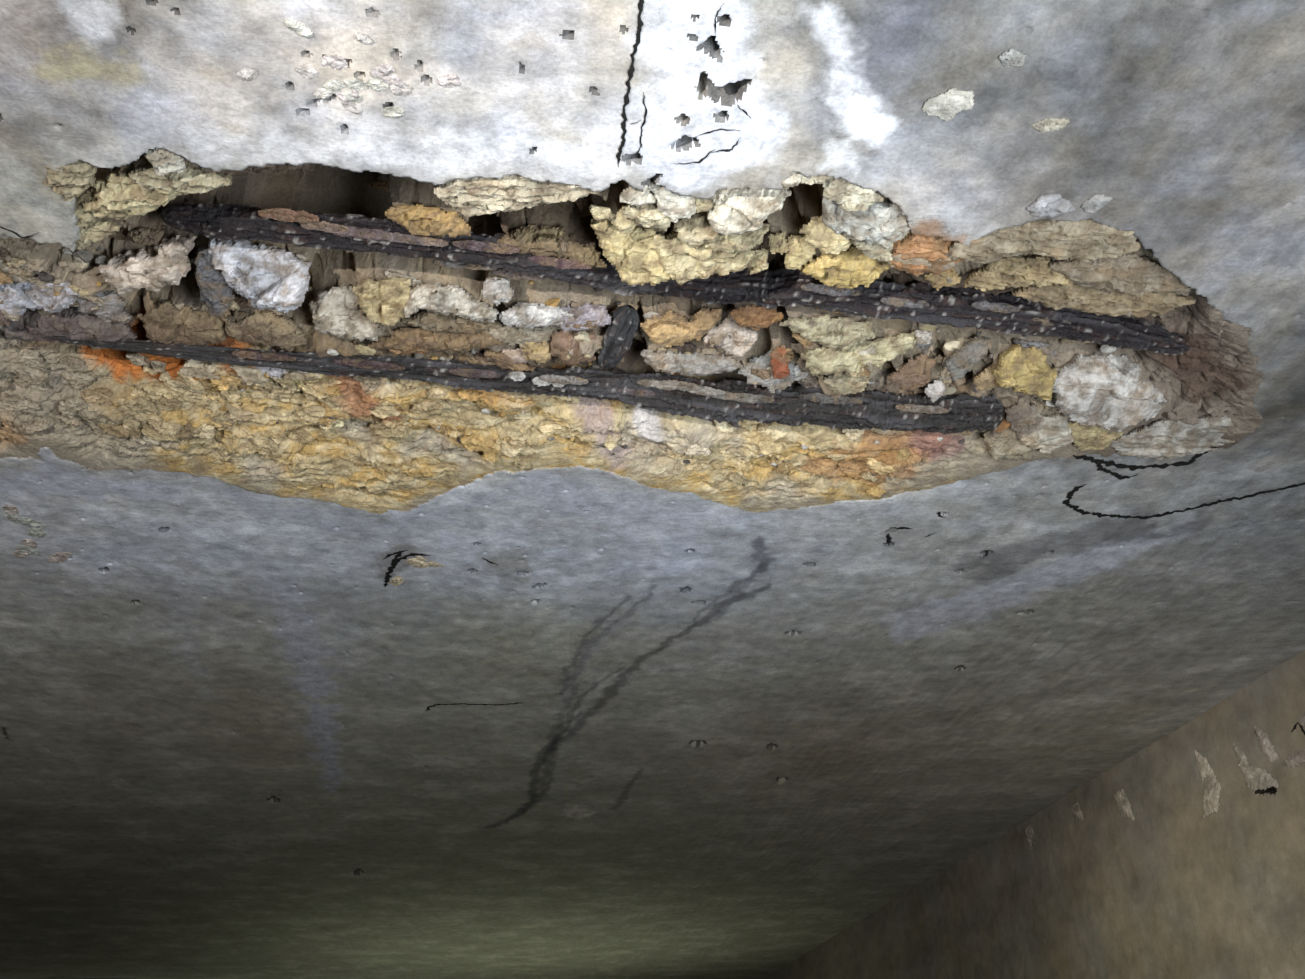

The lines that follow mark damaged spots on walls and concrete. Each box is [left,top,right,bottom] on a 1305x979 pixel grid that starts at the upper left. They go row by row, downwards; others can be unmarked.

crack [616,0,647,167]
spalling [0,7,1265,515]
rust [45,203,1264,490]
rust [0,412,39,457]
crack [1062,445,1305,519]
peeling [2,505,73,564]
crack [426,703,518,711]
peeling [1114,789,1135,821]
peeling [1194,750,1221,819]
peeling [1233,711,1305,795]